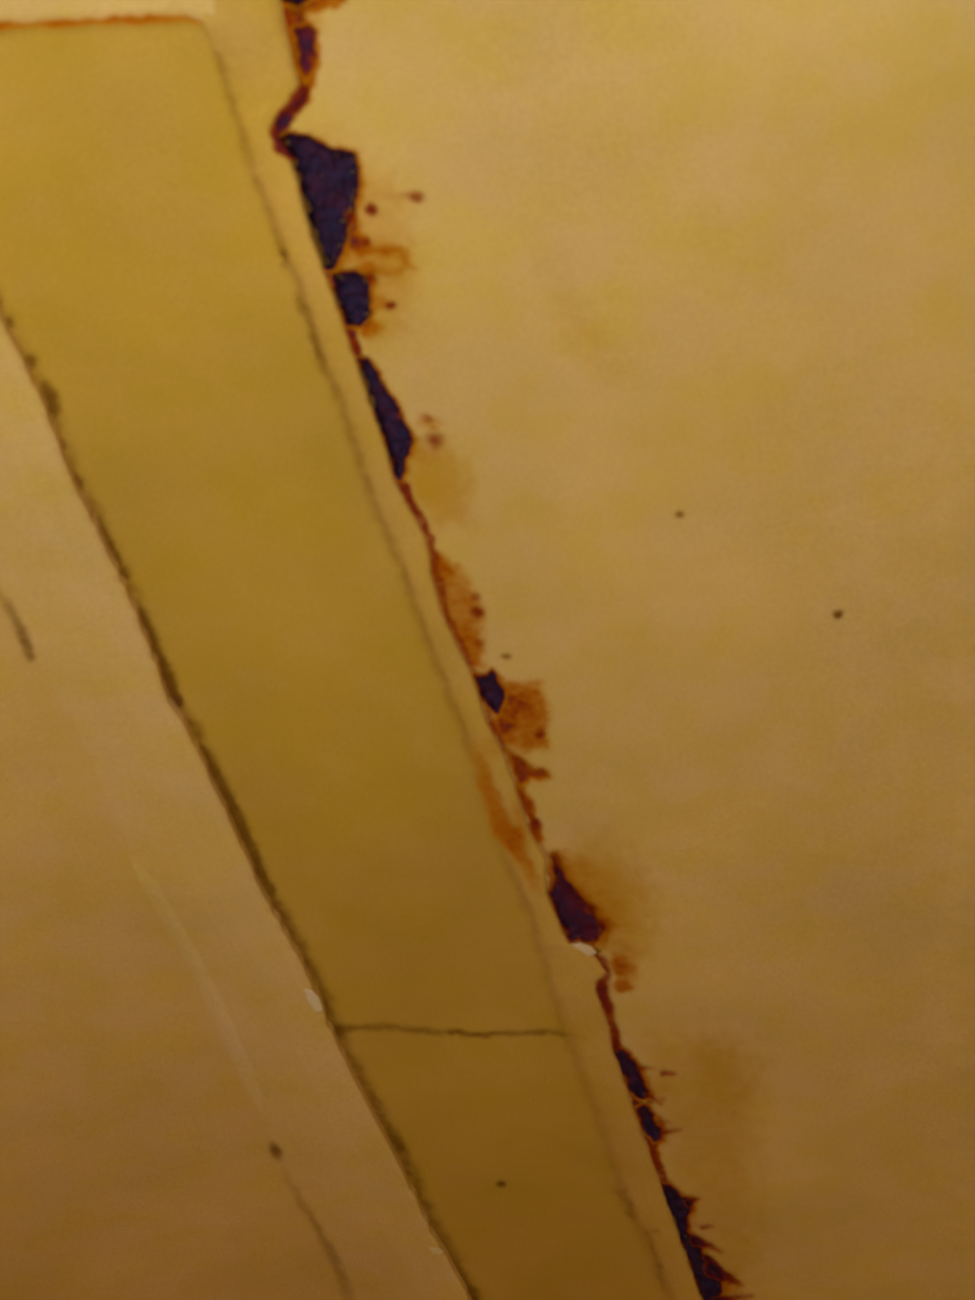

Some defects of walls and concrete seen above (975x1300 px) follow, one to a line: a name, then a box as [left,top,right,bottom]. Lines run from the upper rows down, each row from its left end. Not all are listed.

spalling [280,0,346,104]
spalling [278,130,439,482]
corrosion [431,554,484,667]
corrosion [477,756,533,877]
spalling [472,667,618,956]
corrosion [610,955,636,993]
spalling [612,1046,743,1300]